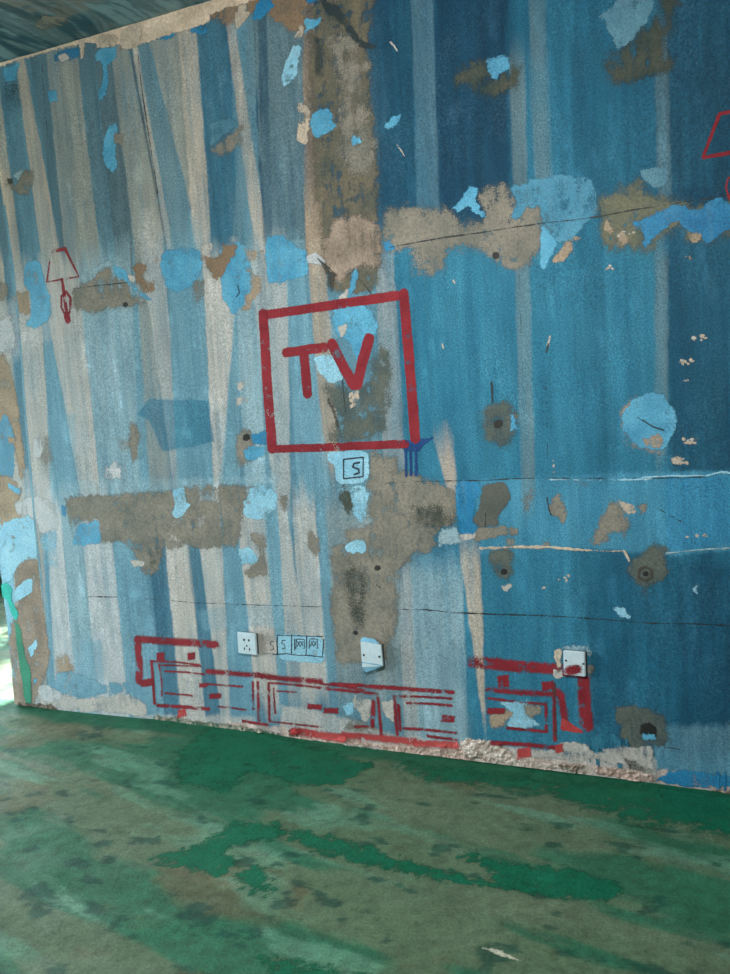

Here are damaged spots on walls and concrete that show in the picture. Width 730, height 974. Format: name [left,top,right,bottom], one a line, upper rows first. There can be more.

peeling [102,123,123,173]
peeling [72,234,308,315]
crack [391,207,651,283]
flaking render [188,0,730,669]
flaking render [0,260,730,839]
crack [400,609,730,627]
peeling [146,818,631,902]